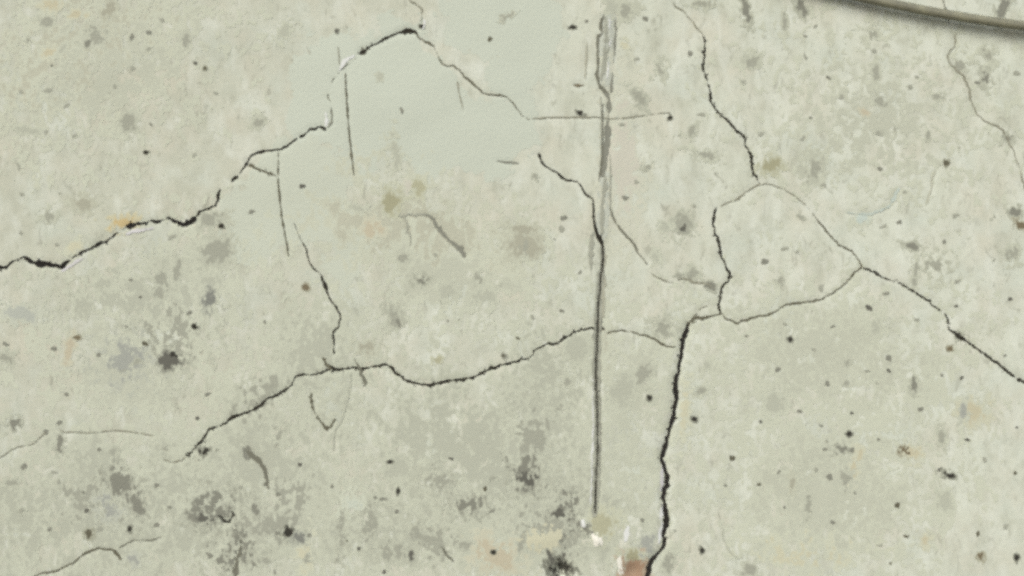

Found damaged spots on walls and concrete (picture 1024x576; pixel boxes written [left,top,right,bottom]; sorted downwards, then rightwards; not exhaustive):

crack [0,0,670,271]
crack [294,224,341,354]
crack [602,0,1024,576]
crack [0,429,153,458]
crack [246,450,269,489]
crack [164,327,595,463]
crack [35,535,163,576]
crack [218,511,242,576]